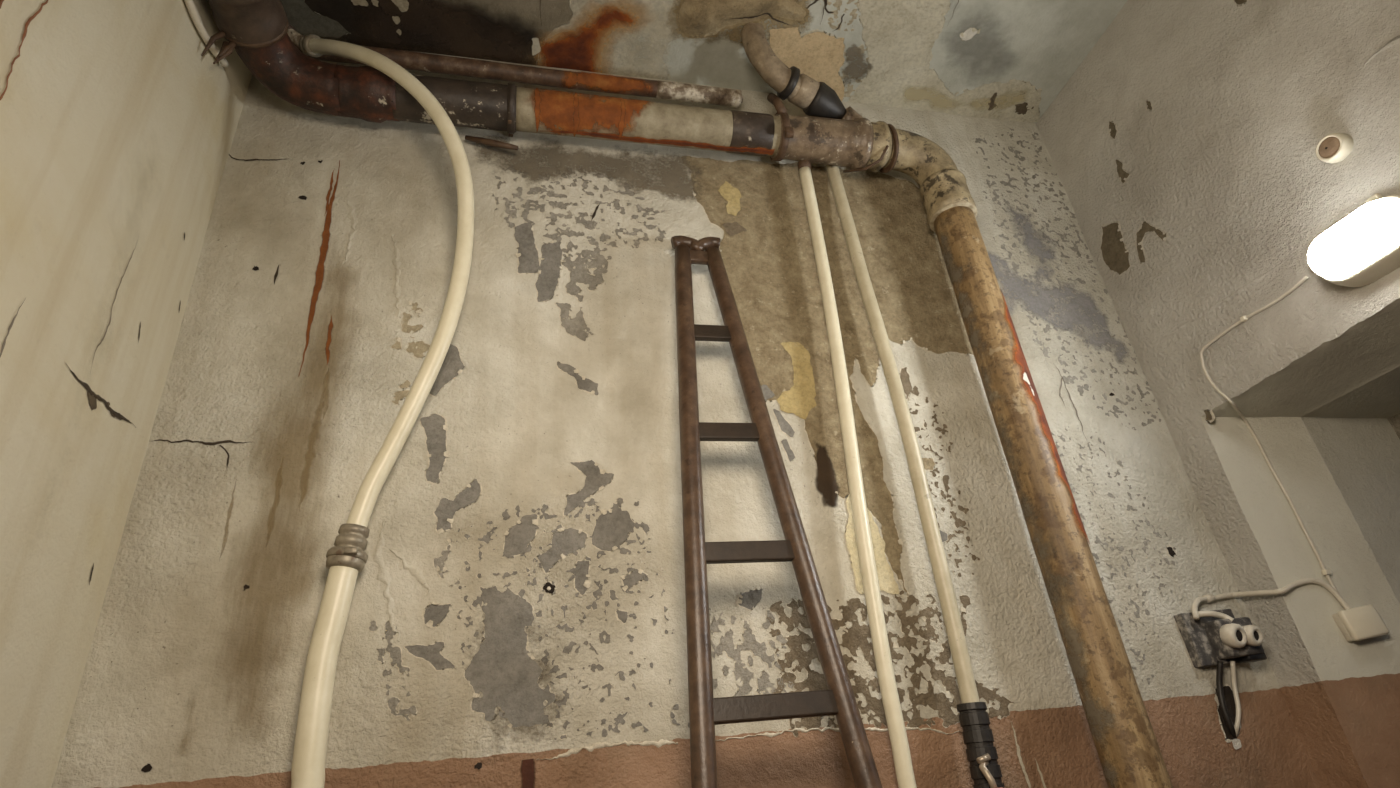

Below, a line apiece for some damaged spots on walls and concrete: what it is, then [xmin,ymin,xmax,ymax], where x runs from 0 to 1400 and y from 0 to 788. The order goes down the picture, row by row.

corrosion [0,0,48,100]
peeling [433,0,573,64]
corrosion [532,5,775,155]
crack [806,0,845,31]
crack [90,237,141,372]
corrosion [298,160,340,377]
peeling [492,166,666,342]
peeling [798,0,1177,685]
crack [154,439,247,467]
spalling [682,155,980,728]
peeling [369,344,690,740]
spalling [1214,684,1241,750]